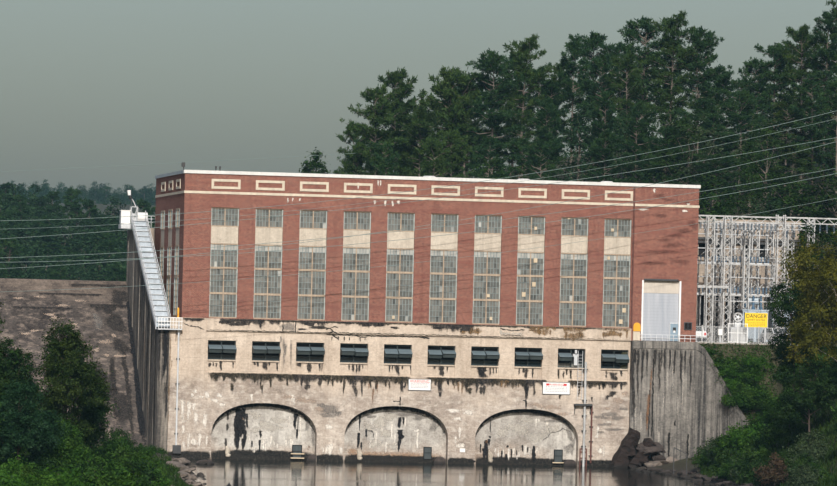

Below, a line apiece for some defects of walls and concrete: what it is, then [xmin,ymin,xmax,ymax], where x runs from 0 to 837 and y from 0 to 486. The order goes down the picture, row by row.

damp [39,273,211,444]
damp [167,319,607,466]
damp [578,446,611,467]
damp [557,349,692,438]